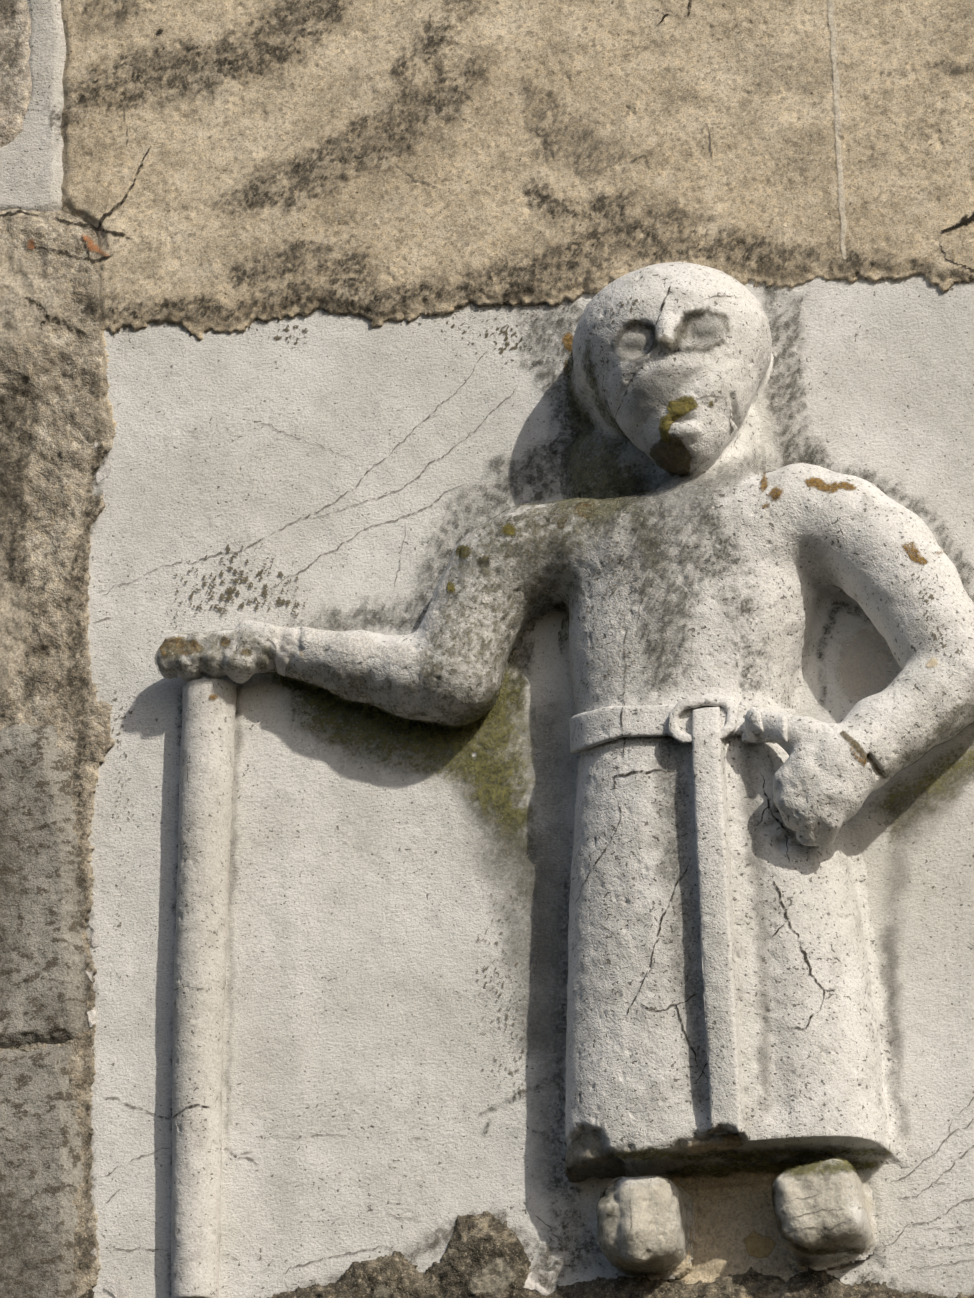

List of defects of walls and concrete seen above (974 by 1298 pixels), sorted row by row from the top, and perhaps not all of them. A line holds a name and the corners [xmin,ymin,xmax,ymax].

crack [93,352,516,623]
leakage [767,454,974,598]
crack [575,542,675,946]
crack [627,864,708,1081]
crack [756,775,833,1030]
spalling [374,1286,390,1298]
spalling [470,1258,556,1297]
spalling [565,1131,873,1284]
crack [789,1195,851,1233]
crack [869,1097,974,1270]